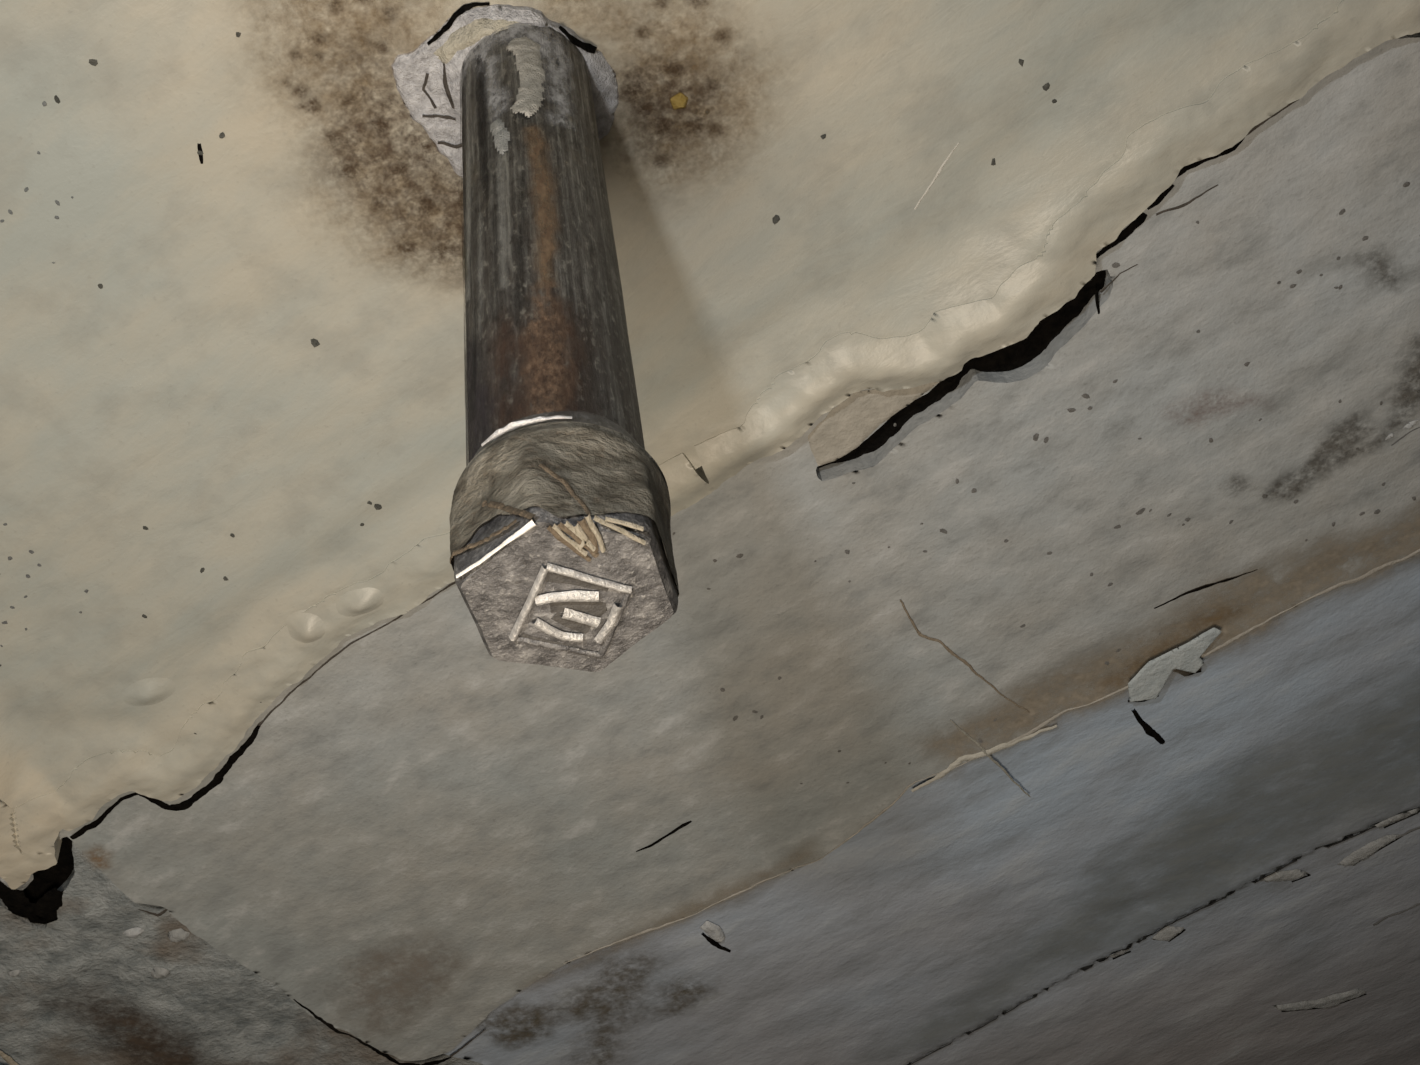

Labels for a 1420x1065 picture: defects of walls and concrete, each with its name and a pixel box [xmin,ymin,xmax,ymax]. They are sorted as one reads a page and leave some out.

corrosion [294,0,464,254]
corrosion [618,11,744,164]
corrosion [495,287,577,429]
peeling [658,0,1420,516]
flaking render [0,532,483,1065]
crack [636,821,692,852]
peeling [564,549,1420,964]
crack [1131,709,1165,744]
crack [907,807,1420,1065]